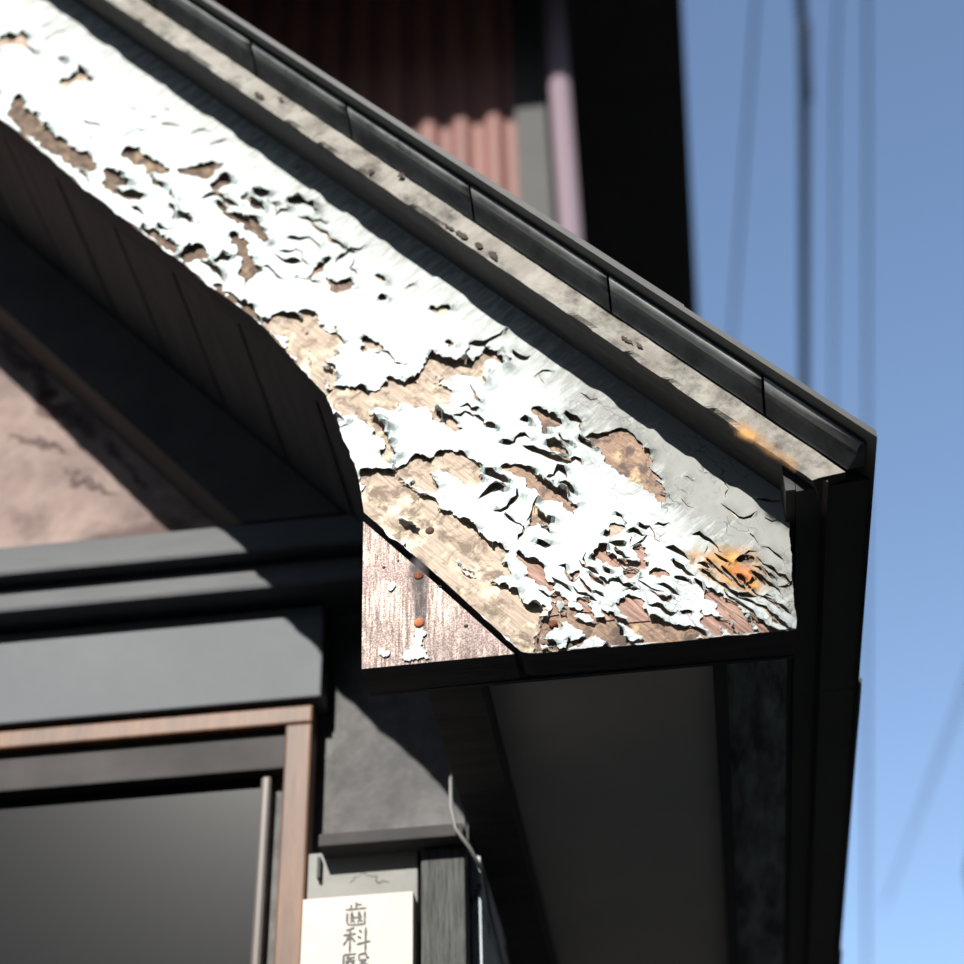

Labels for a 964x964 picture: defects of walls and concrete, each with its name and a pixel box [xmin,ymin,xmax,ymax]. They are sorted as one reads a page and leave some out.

peeling [0,29,98,89]
peeling [0,85,796,653]
peeling [402,628,429,661]